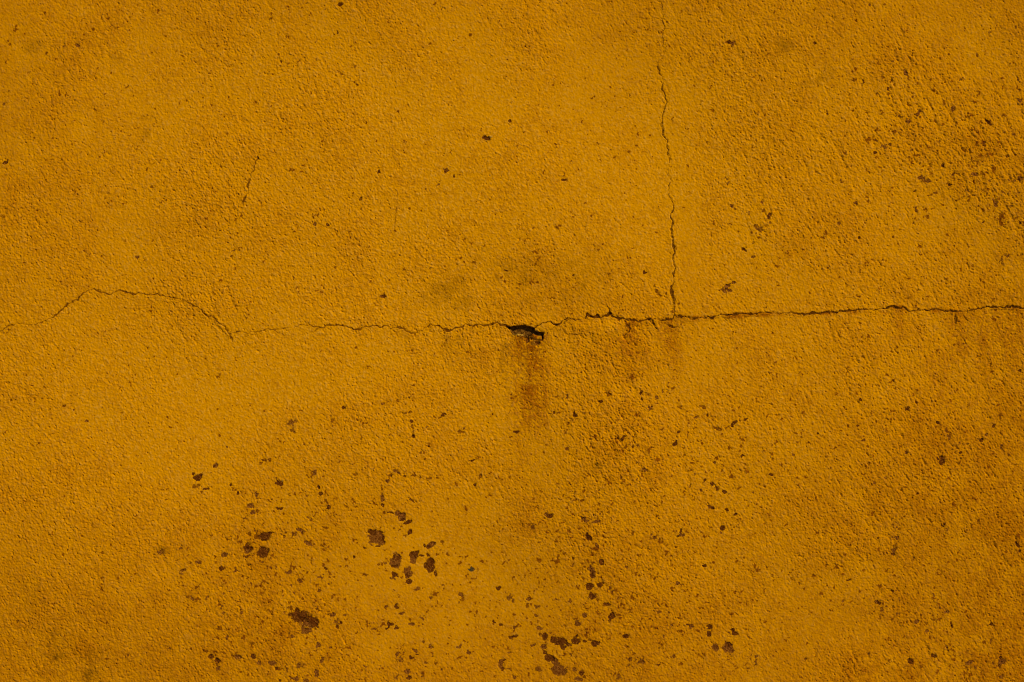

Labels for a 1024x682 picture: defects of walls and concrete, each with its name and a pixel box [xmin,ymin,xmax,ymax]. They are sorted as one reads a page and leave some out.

crack [657,66,669,155]
crack [2,185,1024,344]
hole [509,325,544,345]
peeling [192,463,218,494]
peeling [380,469,432,536]
peeling [203,492,356,682]
peeling [353,529,474,630]
peeling [496,513,621,681]
peeling [395,638,443,680]